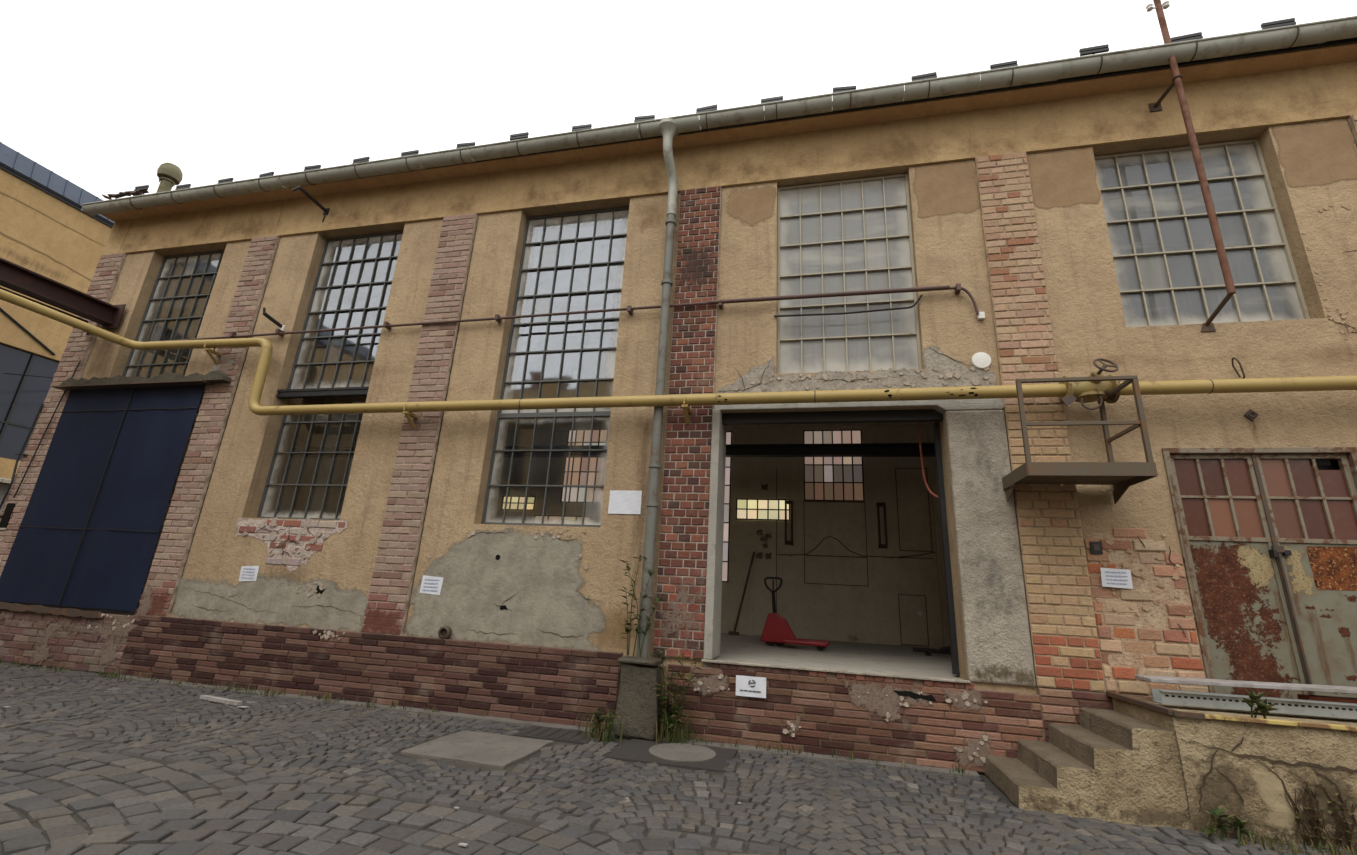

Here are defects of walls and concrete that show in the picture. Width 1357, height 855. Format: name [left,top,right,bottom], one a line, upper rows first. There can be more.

peeling [715,346,997,402]
flaking render [233,517,349,597]
corrosion [1306,546,1357,602]
corrosion [1189,535,1302,699]
corrosion [1305,606,1350,637]
spalling [842,678,995,767]
crack [1181,737,1357,819]